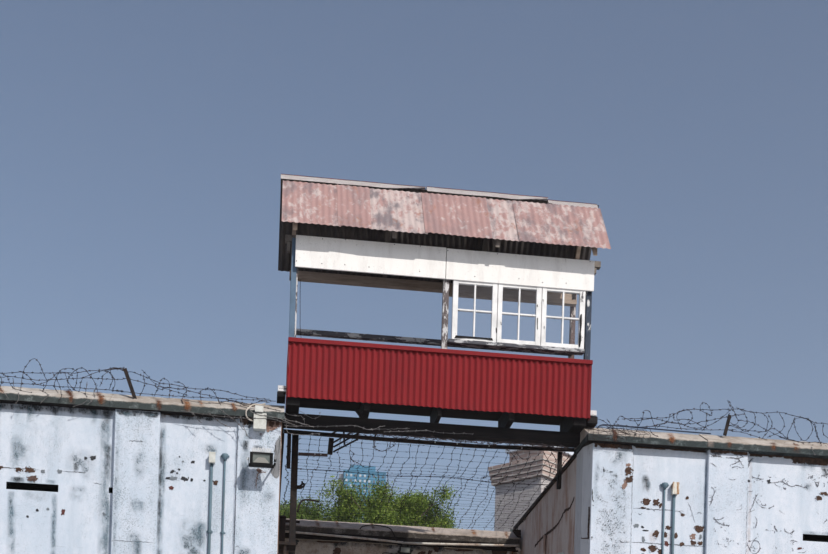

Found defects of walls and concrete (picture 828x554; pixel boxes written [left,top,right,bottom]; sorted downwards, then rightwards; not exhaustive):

peeling [15,466,45,482]
leakage [0,403,158,548]
peeling [165,456,195,490]
peeling [603,463,634,489]
peeling [594,443,828,473]
peeling [640,498,662,510]
leakage [182,524,204,554]
peeling [633,524,705,554]